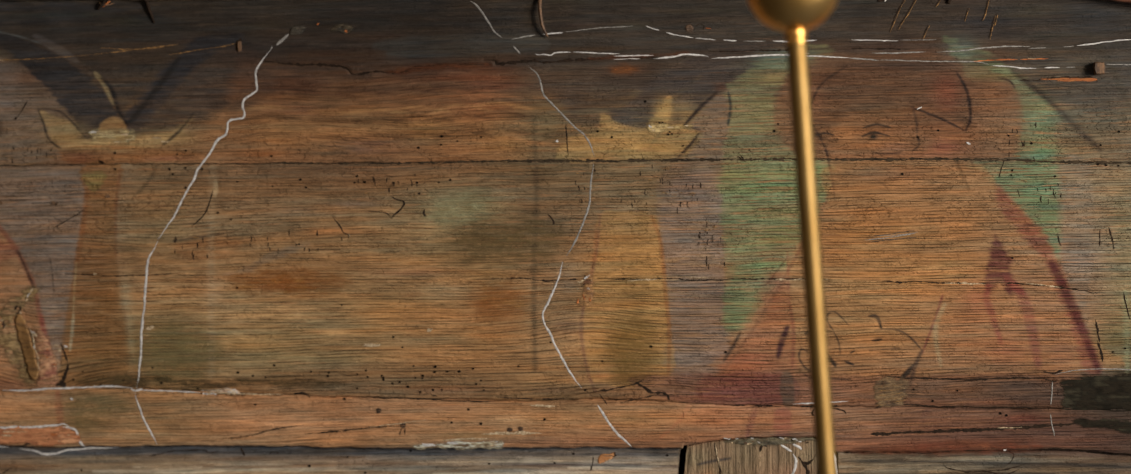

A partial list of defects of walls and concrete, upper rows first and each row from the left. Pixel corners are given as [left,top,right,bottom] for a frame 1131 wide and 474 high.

crack [807,39,1131,69]
crack [815,120,1131,205]
crack [0,1,826,457]
crack [869,230,917,242]
crack [732,401,847,415]
crack [759,281,1131,474]